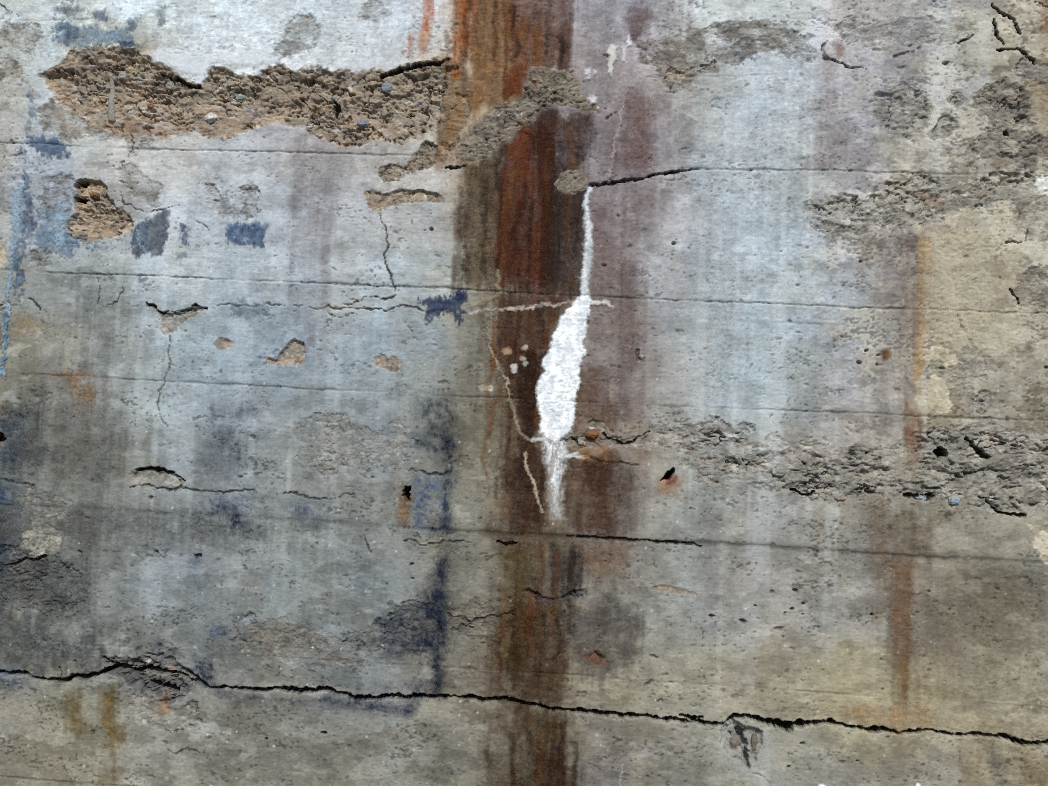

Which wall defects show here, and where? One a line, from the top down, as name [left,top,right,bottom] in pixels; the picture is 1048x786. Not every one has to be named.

corrosion [452,0,573,109]
crack [957,0,1048,65]
spalling [0,5,602,296]
crack [587,167,702,189]
spalling [128,470,186,489]
crack [96,213,447,428]
corrosion [452,108,601,786]
water stain [514,186,611,513]
corrosion [577,368,612,422]
corrosion [560,439,632,535]
spalling [568,317,1048,565]
crack [0,656,1048,786]